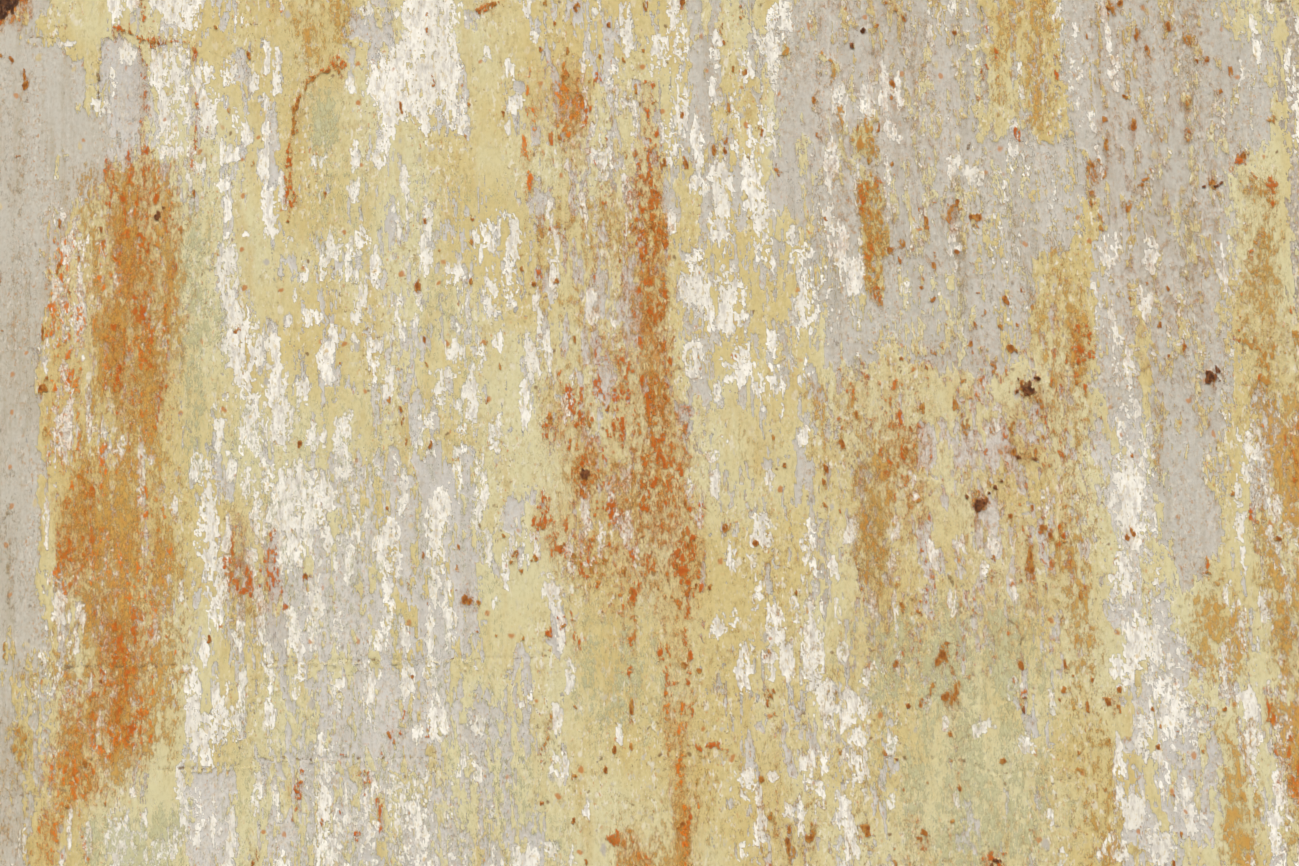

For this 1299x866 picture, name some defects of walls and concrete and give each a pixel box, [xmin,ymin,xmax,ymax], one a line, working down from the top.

peeling [504,58,567,158]
rust [520,47,602,193]
rust [836,105,905,302]
rust [918,199,982,230]
rust [1235,151,1281,296]
rust [0,0,198,865]
rust [509,80,728,790]
peeling [539,571,577,738]
peeling [726,714,780,866]
peeling [911,510,948,636]
peeling [1003,561,1065,757]
peeling [1211,579,1299,866]